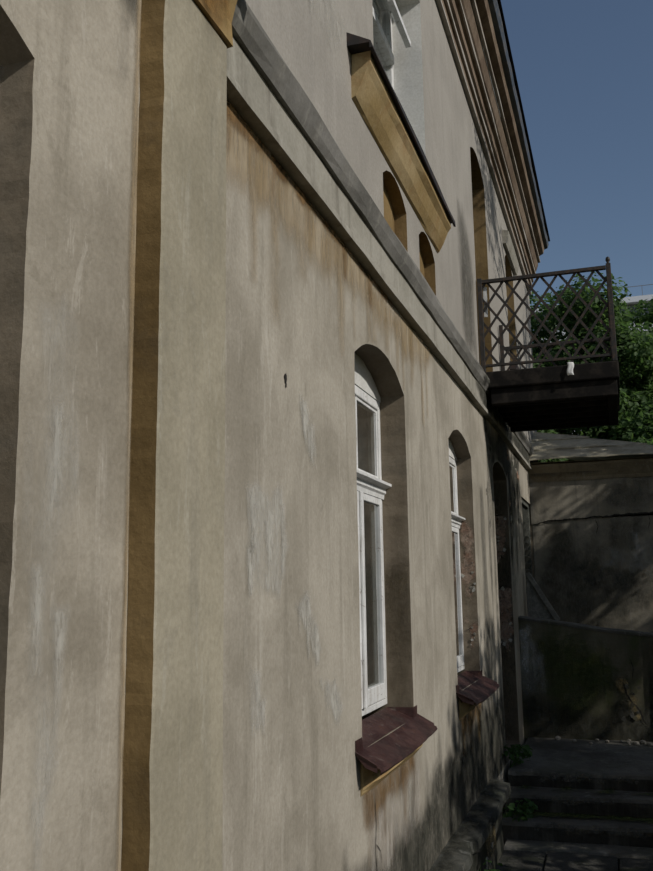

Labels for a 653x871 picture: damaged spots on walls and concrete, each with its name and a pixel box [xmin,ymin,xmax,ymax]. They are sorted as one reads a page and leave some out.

flaking render [461,521,476,597]
flaking render [490,515,507,563]
crack [532,511,653,534]
flaking render [498,587,514,650]
damp [364,632,653,871]